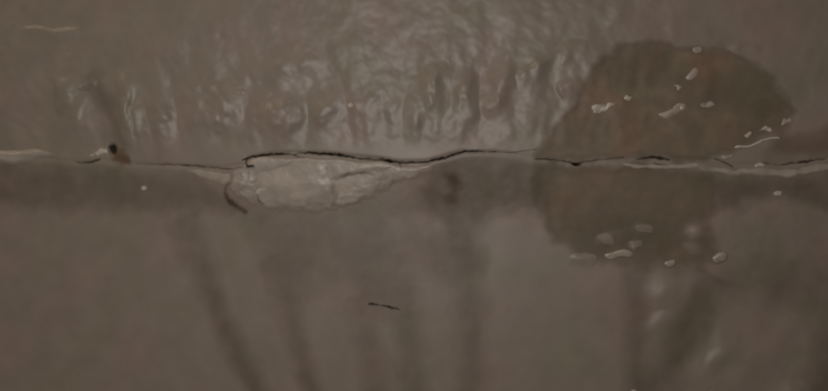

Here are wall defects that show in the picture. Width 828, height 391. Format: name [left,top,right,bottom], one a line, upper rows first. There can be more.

crack [243,153,284,167]
crack [305,150,355,158]
crack [380,150,495,163]
flaking render [182,156,434,214]